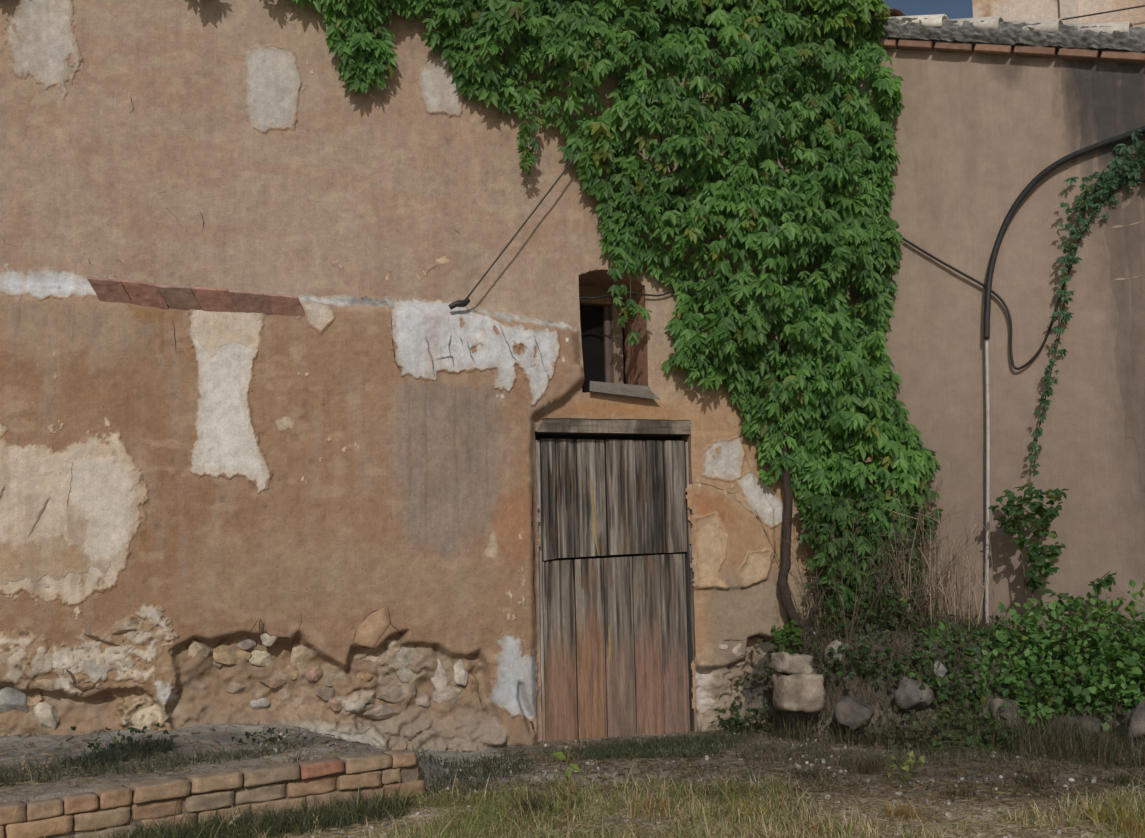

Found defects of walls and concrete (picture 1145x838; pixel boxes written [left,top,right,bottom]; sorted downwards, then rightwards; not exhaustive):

peeling [2,0,84,101]
peeling [241,43,314,135]
peeling [415,47,465,119]
peeling [0,264,137,302]
peeling [184,309,274,495]
peeling [386,297,570,411]
water stain [897,40,1145,592]
peeling [688,432,784,591]
peeling [0,416,540,736]